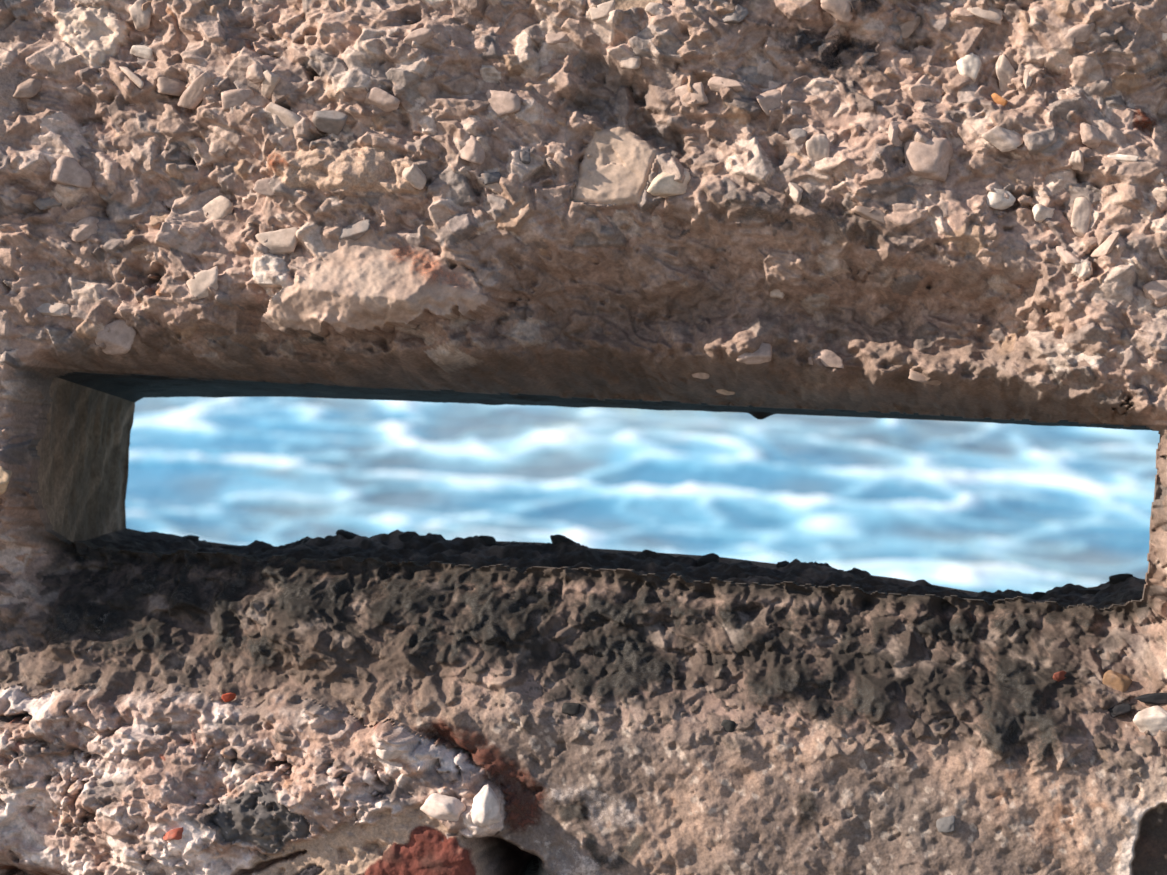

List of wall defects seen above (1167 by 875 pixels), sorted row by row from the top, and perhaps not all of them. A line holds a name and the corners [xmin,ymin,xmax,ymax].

crack [455,831,545,875]
peeling [1115,800,1167,875]